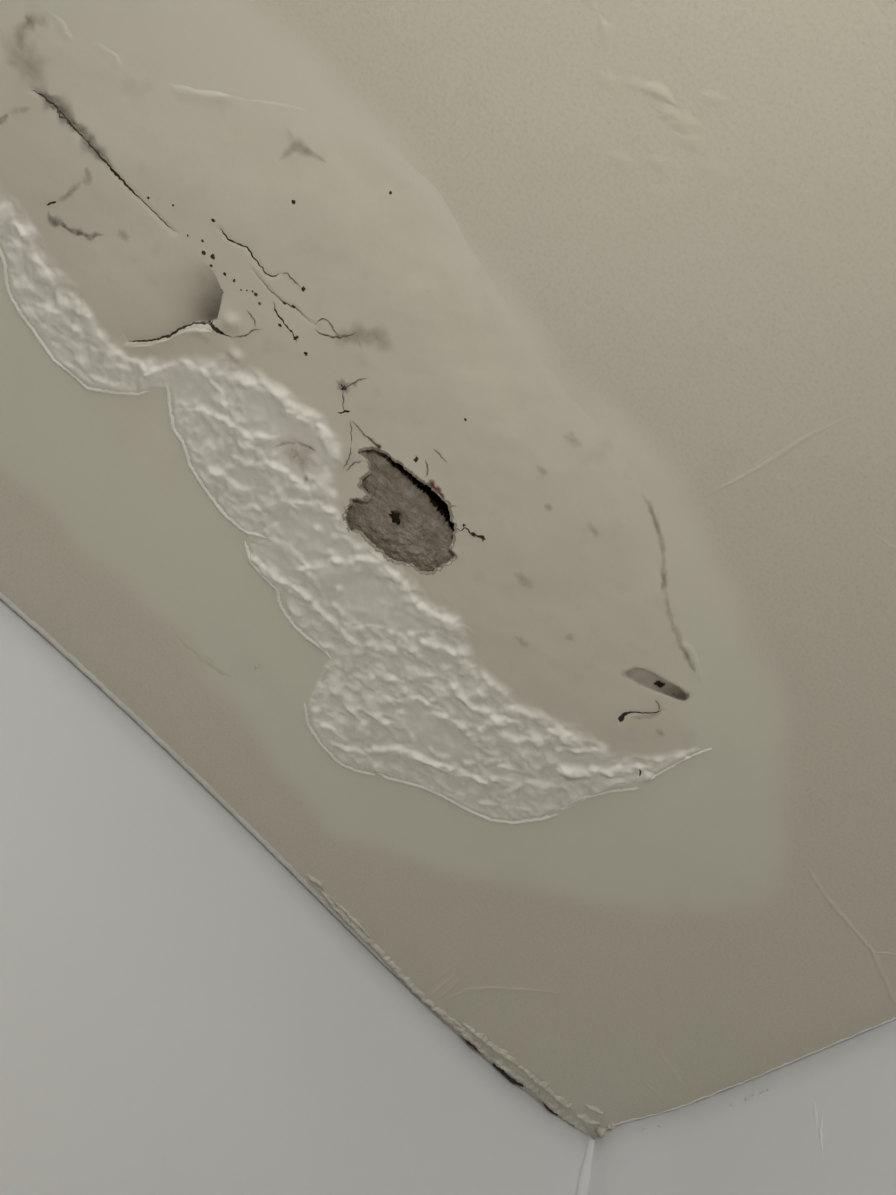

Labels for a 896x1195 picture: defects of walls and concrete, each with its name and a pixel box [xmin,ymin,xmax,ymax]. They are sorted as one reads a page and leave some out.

crack [32,90,171,228]
crack [129,218,353,356]
flaking render [0,195,712,825]
flaking render [307,874,616,1137]